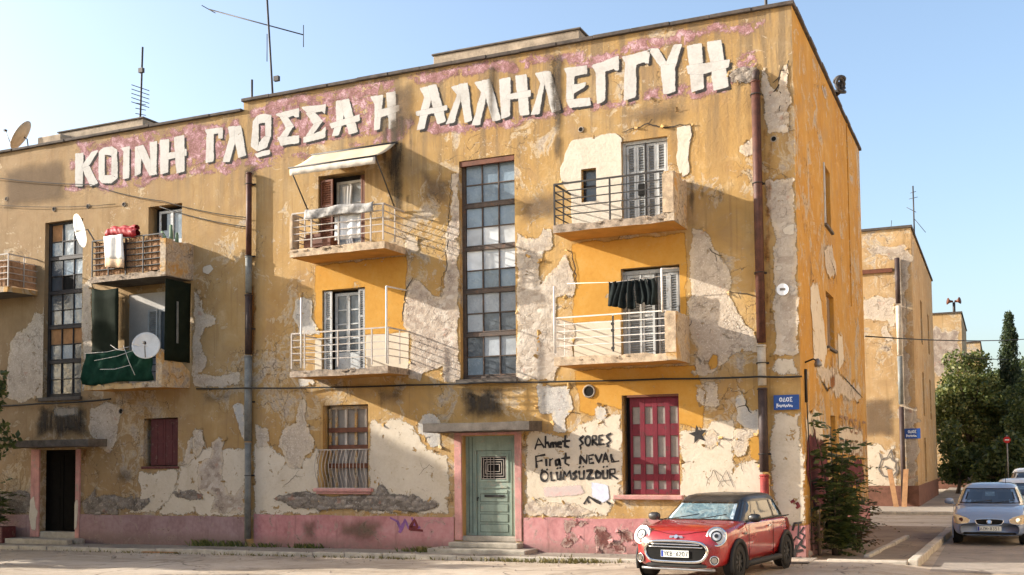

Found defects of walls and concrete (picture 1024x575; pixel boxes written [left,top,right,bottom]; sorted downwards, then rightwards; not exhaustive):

flaking render [726,63,792,142]
flaking render [6,307,44,403]
damp [37,408,85,435]
flaking render [81,279,93,364]
flaking render [191,292,242,388]
peeling [74,379,453,530]
flaking render [403,173,461,383]
damp [465,389,501,415]
flaking render [515,228,634,554]
flaking render [679,227,825,526]
flaking render [765,177,861,403]